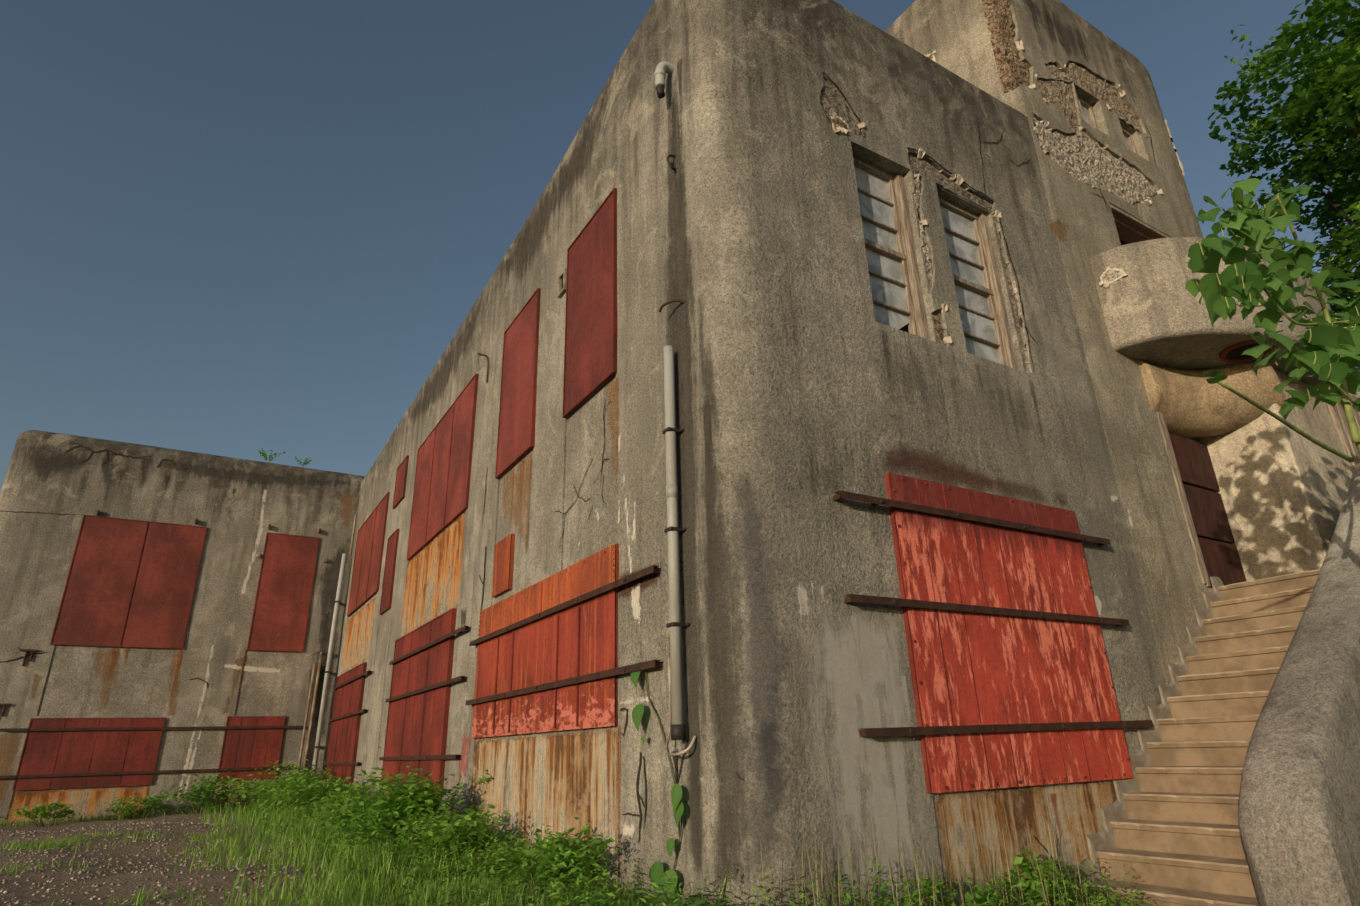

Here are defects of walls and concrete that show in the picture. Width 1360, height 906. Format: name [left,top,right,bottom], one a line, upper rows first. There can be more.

spalling [820,79,866,136]
spalling [982,0,1164,205]
spalling [908,148,1029,372]
crack [65,443,177,467]
leakage [140,457,344,494]
crack [555,398,613,548]
leakage [666,59,781,883]
corrosion [169,651,183,715]
corrosion [470,726,620,893]
corrosion [936,780,1117,906]